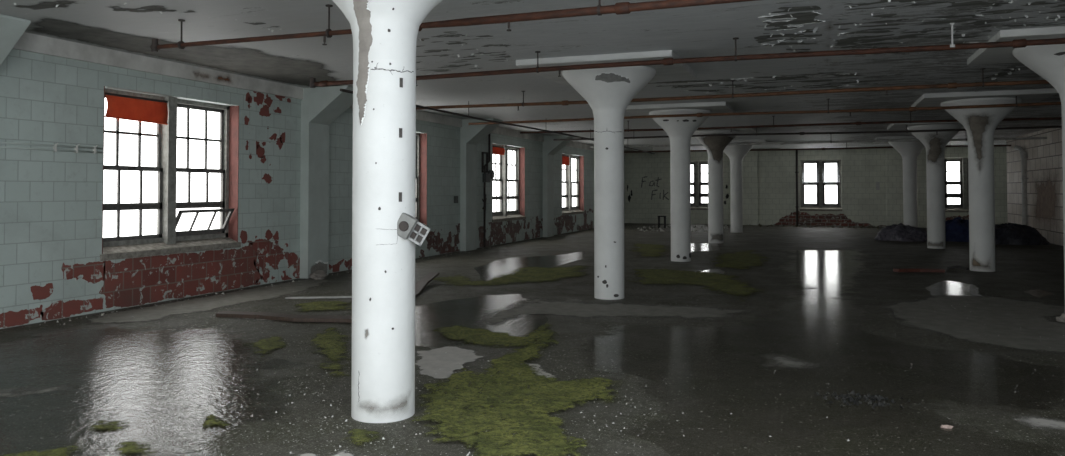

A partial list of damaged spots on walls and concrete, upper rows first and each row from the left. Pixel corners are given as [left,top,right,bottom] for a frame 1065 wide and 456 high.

peeling [14,1,75,10]
peeling [110,3,195,14]
peeling [754,0,1065,55]
peeling [353,0,376,126]
spalling [244,91,291,184]
leakage [967,115,990,170]
spalling [419,223,460,258]
spalling [478,209,593,248]
spalling [773,211,887,227]
spalling [0,229,352,328]